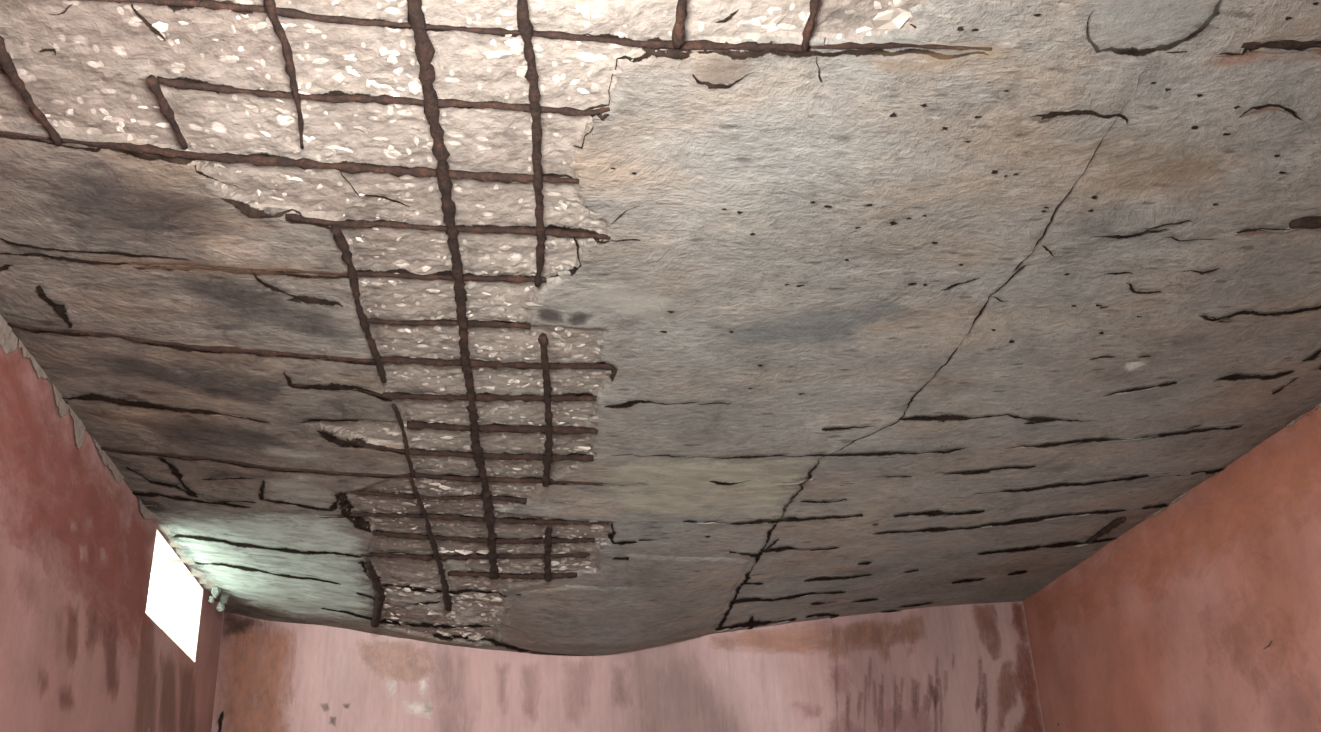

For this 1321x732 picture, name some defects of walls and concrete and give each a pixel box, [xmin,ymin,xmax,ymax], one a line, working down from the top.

spalling [0,0,992,644]
crack [604,0,1321,633]
water stain [0,359,194,732]
water stain [141,500,210,579]
spalling [1085,516,1126,544]
water stain [741,620,918,658]
water stain [975,606,998,653]
water stain [1000,605,1042,732]